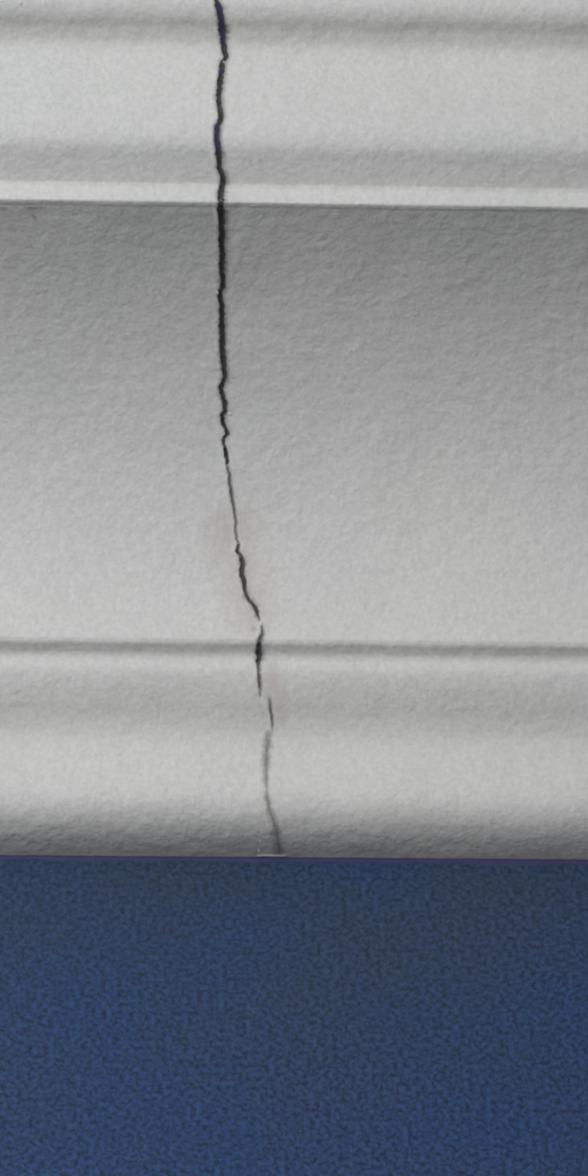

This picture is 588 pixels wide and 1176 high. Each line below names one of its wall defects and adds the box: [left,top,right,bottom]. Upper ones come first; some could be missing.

crack [214,0,287,857]